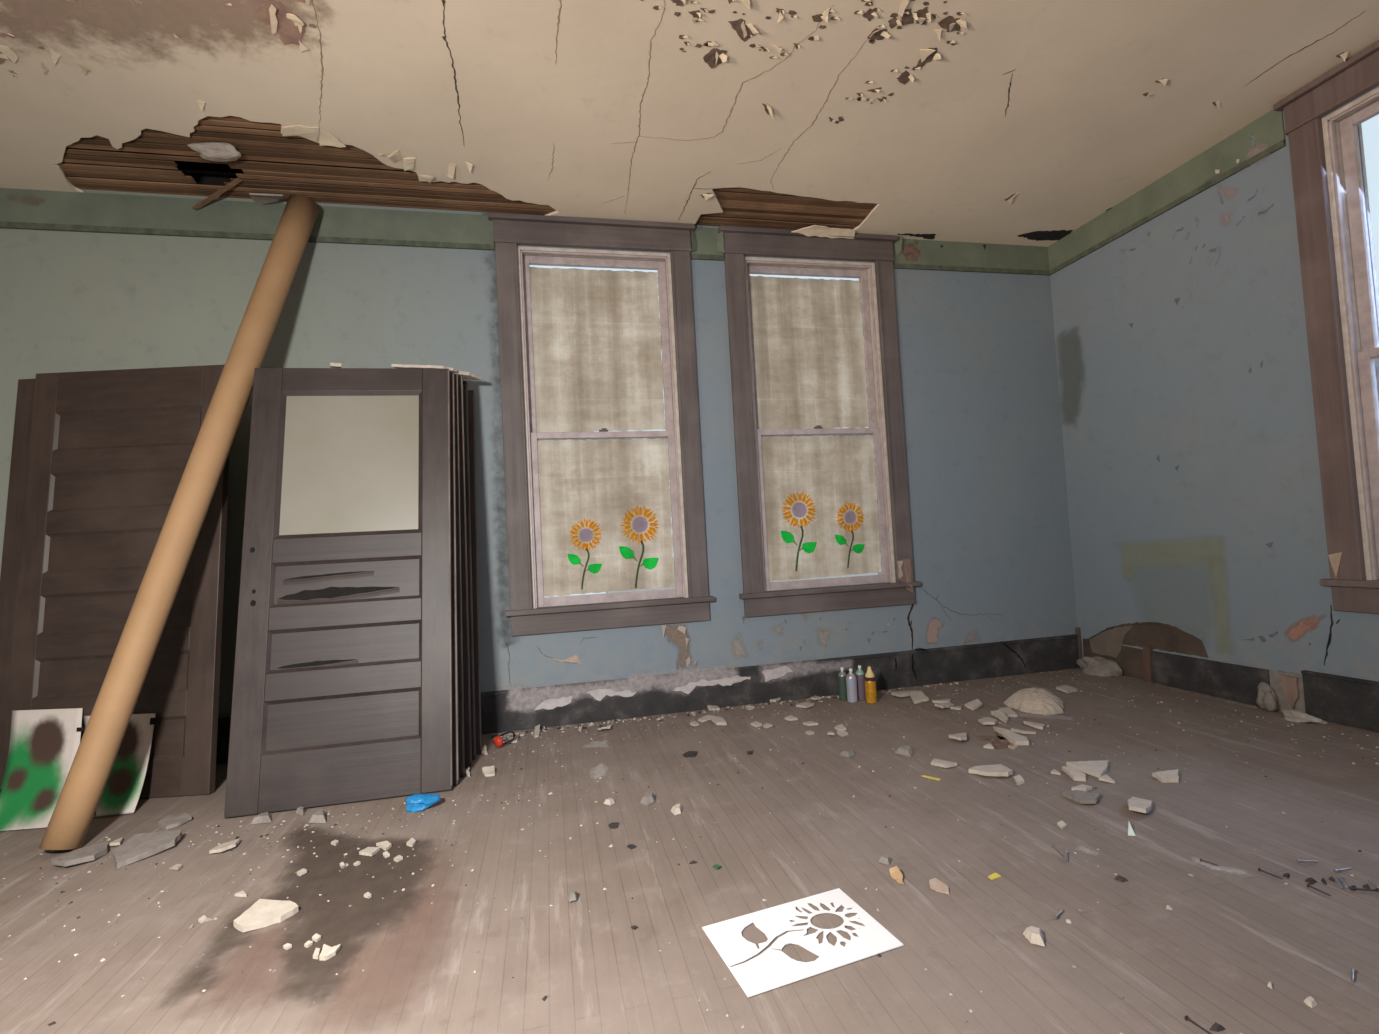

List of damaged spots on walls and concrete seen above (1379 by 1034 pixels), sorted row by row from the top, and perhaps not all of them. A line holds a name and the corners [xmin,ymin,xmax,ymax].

peeling [0,0,323,78]
flaking render [58,101,556,215]
crack [312,0,324,127]
crack [442,0,464,145]
crack [605,0,867,221]
peeling [641,0,967,104]
flaking render [691,187,877,253]
crack [895,585,1026,679]
spalling [1076,622,1208,682]
leakage [270,829,425,995]